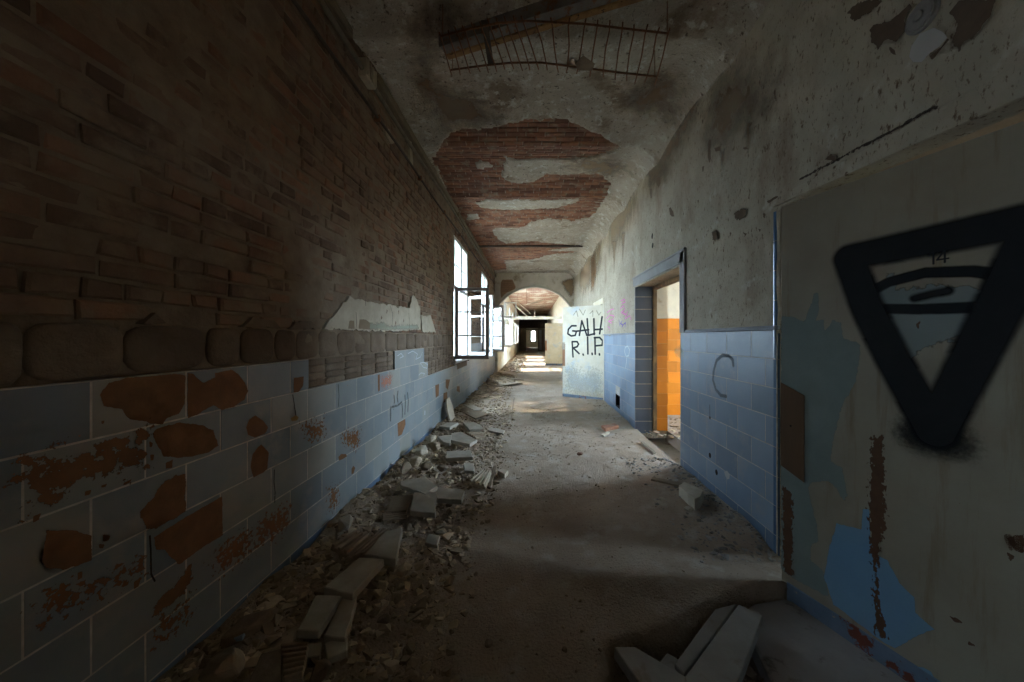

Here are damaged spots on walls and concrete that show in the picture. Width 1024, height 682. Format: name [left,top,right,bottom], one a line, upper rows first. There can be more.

flaking render [847,0,912,55]
flaking render [909,0,995,62]
crack [799,106,938,180]
spalling [0,0,619,389]
peeling [781,487,795,576]
peeling [865,435,890,640]